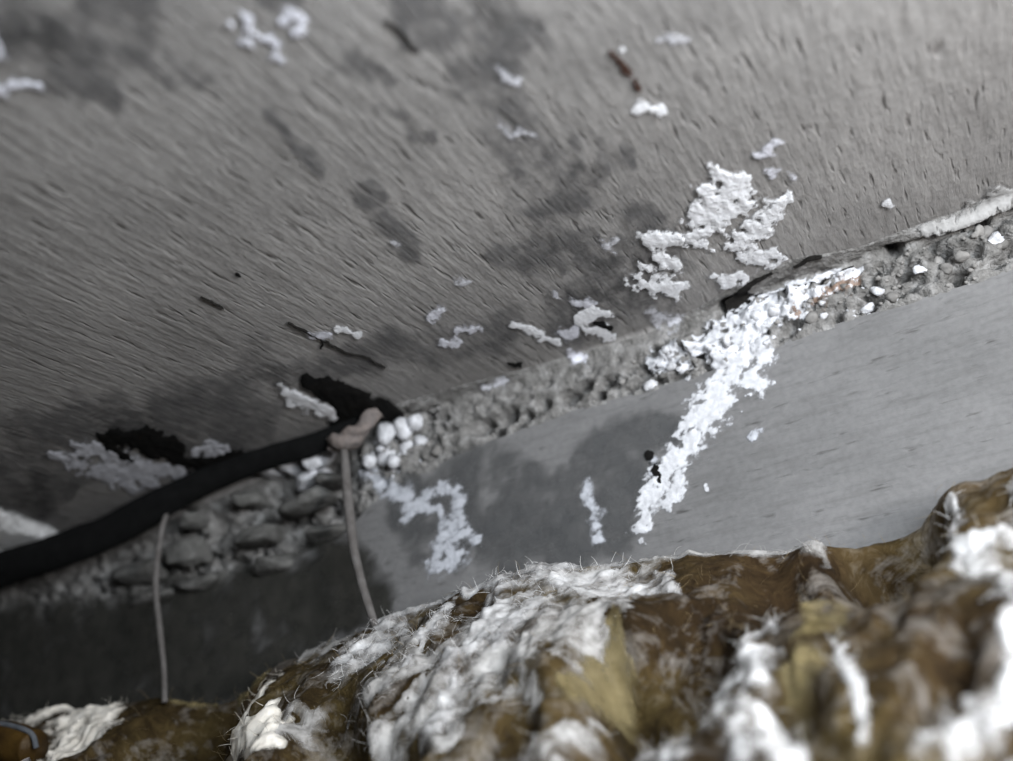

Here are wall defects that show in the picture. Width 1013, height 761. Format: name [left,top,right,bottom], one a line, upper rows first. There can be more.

efflorescence [228,12,285,64]
rust [608,50,642,92]
damp [631,99,668,117]
damp [753,139,785,180]
damp [624,162,796,328]
damp [307,325,363,340]
spalling [593,321,613,331]
peeling [277,373,404,426]
damp [358,266,864,576]
peeling [46,425,243,495]
spalling [644,450,661,484]
spalling [229,450,353,577]